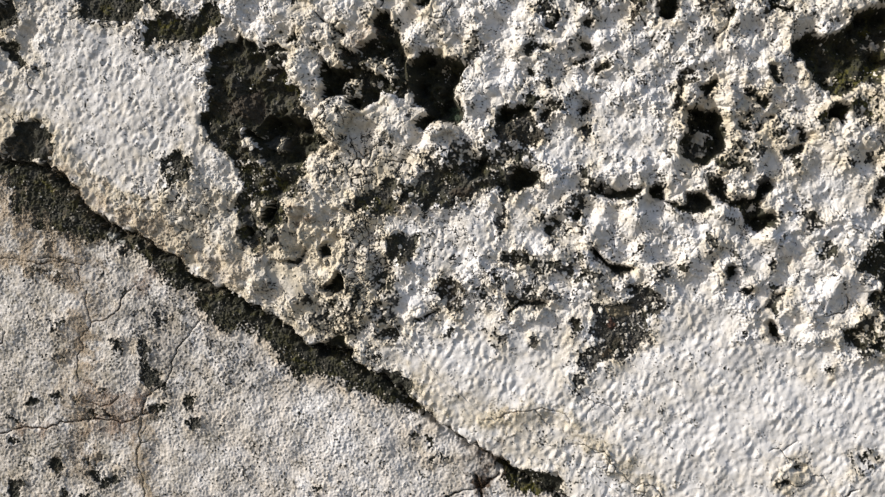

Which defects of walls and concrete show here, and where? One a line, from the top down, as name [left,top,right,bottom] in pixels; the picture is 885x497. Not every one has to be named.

peeling [78,0,224,49]
spalling [791,0,885,131]
crack [0,156,69,179]
peeling [0,0,693,421]
spalling [535,66,778,240]
spalling [775,127,815,176]
crack [2,257,133,381]
damp [59,309,100,452]
crack [0,322,198,497]
crack [84,96,619,497]
crack [575,444,662,497]
spalling [843,231,885,359]